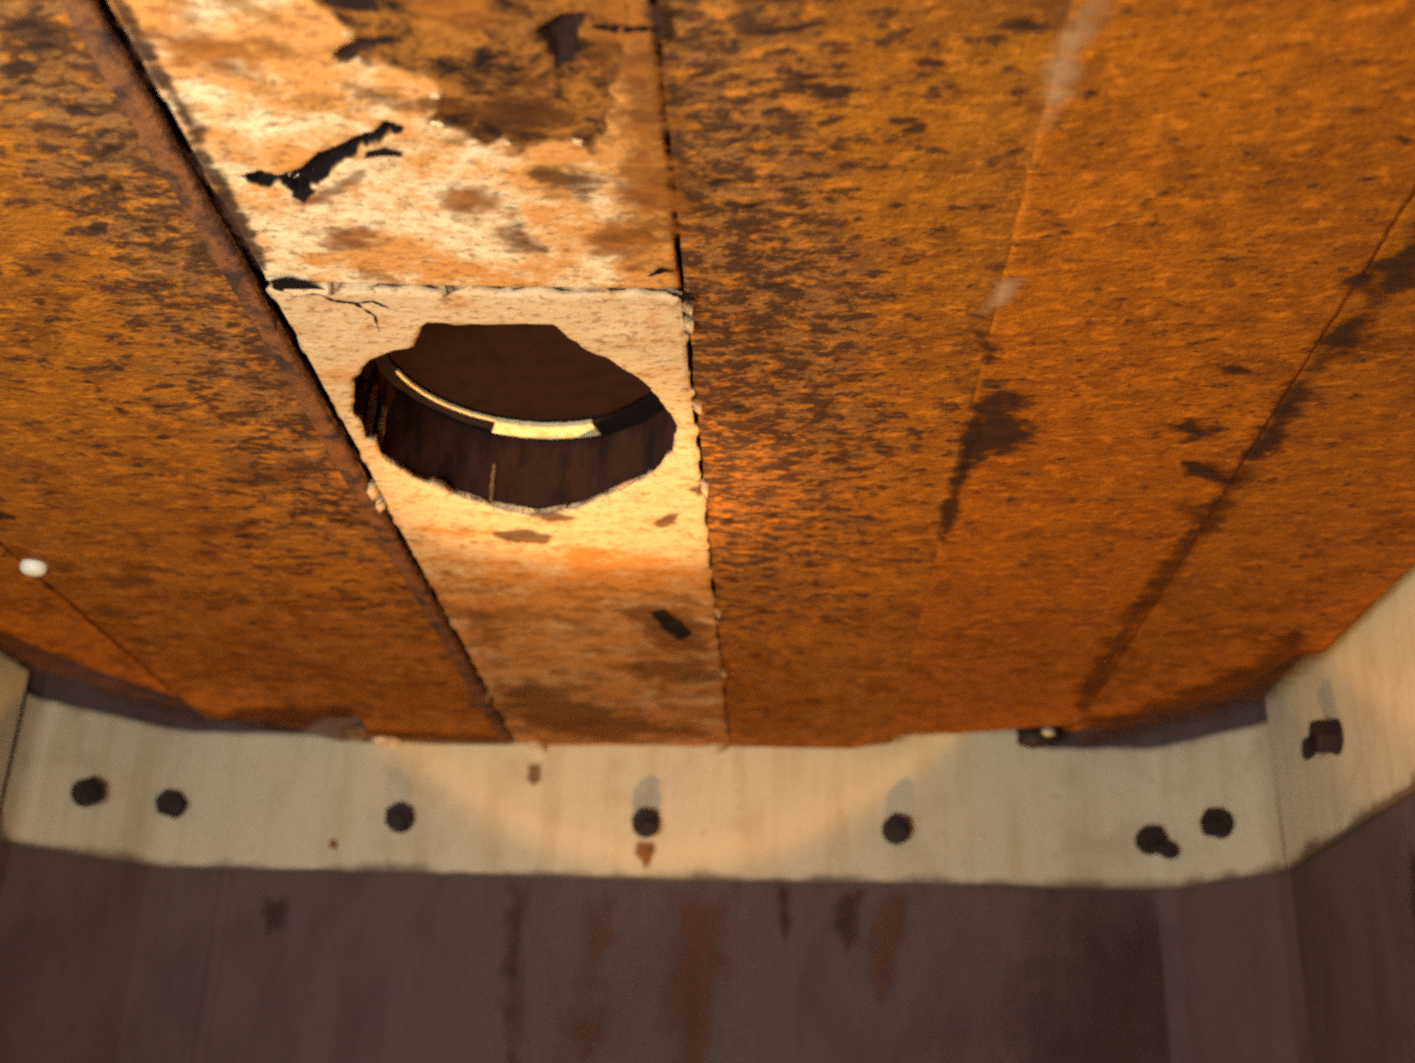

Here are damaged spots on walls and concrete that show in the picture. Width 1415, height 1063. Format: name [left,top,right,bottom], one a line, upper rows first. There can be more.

rust [140,30,282,75]
peeling [313,0,627,153]
crack [242,121,404,203]
rust [320,228,375,251]
rust [439,189,497,214]
rust [586,0,691,271]
leakage [939,406,981,543]
leakage [1074,237,1415,713]
rust [493,513,574,544]
rust [655,514,679,528]
rust [226,707,510,745]
rust [1072,635,1319,745]